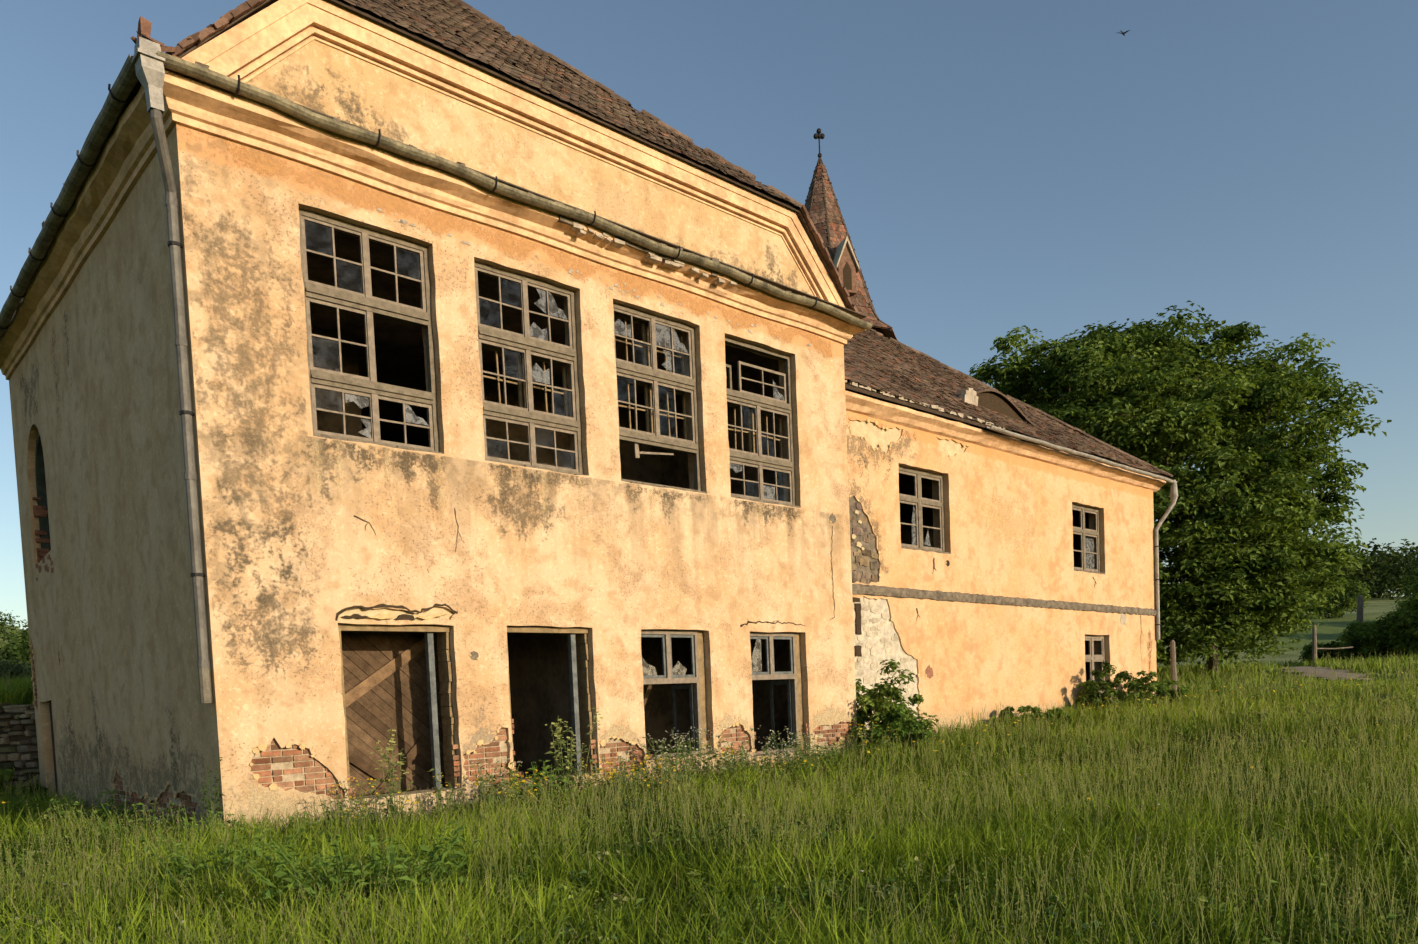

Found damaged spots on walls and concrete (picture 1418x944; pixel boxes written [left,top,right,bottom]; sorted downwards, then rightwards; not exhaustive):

flaking render [32,497,54,581]
water stain [228,594,315,668]
flaking render [805,496,934,765]
flaking render [242,738,355,830]
flaking render [451,717,524,813]
flaking render [589,722,654,787]